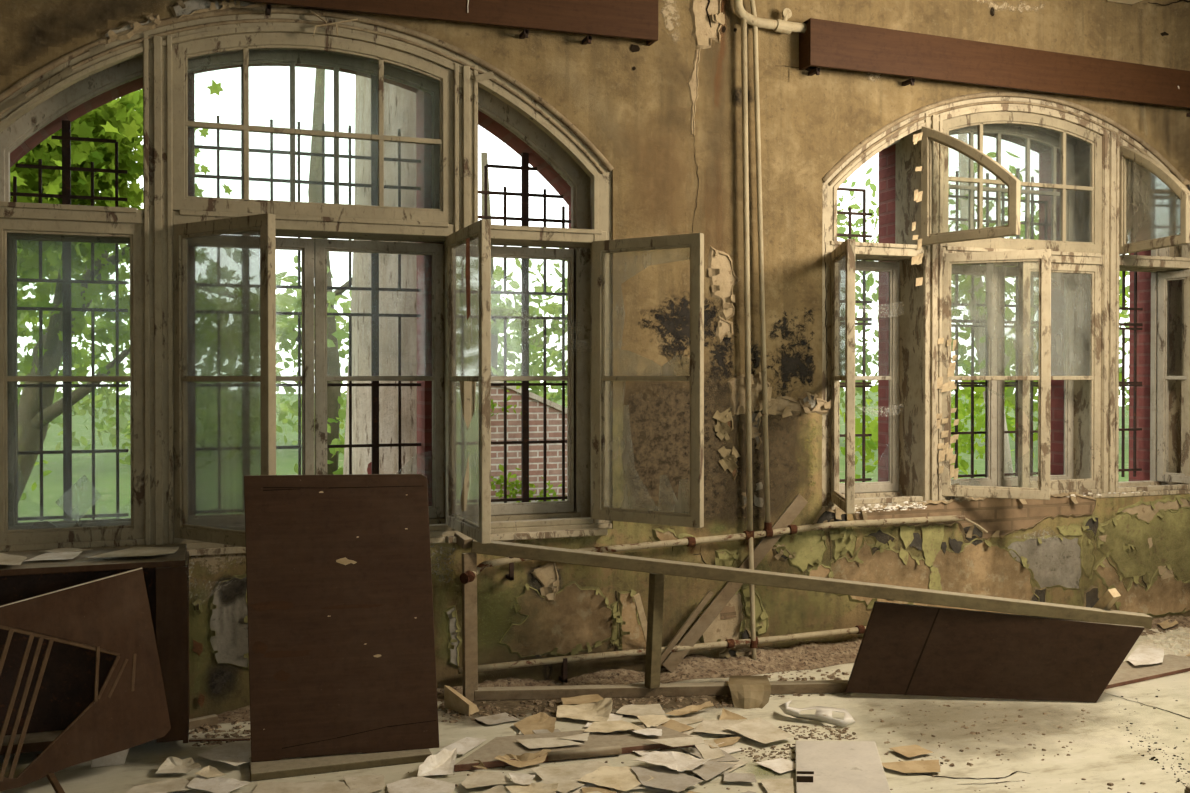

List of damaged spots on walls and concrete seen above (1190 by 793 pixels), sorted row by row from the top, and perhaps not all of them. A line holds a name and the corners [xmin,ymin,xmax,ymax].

crack [1148,0,1190,8]
flaking render [687,0,737,135]
leakage [639,297,690,367]
flaking render [707,246,740,344]
leakage [751,310,814,396]
leakage [623,381,690,513]
leakage [704,301,803,523]
peeling [772,492,1190,617]
flaking render [207,574,249,670]
peeling [497,562,646,659]